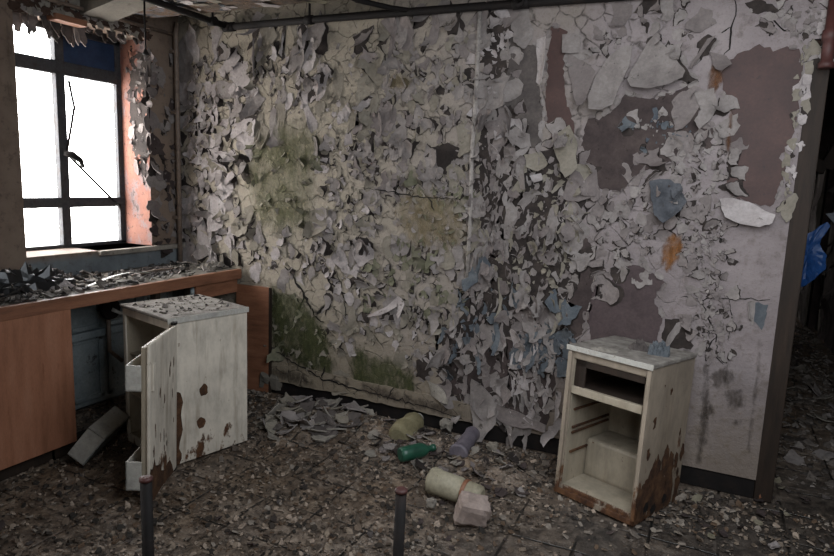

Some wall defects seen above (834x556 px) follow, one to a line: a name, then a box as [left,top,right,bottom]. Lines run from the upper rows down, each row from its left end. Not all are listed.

leakage [272,287,331,373]
flaking render [7,0,828,451]
peeling [808,170,834,233]
peeling [816,222,834,355]